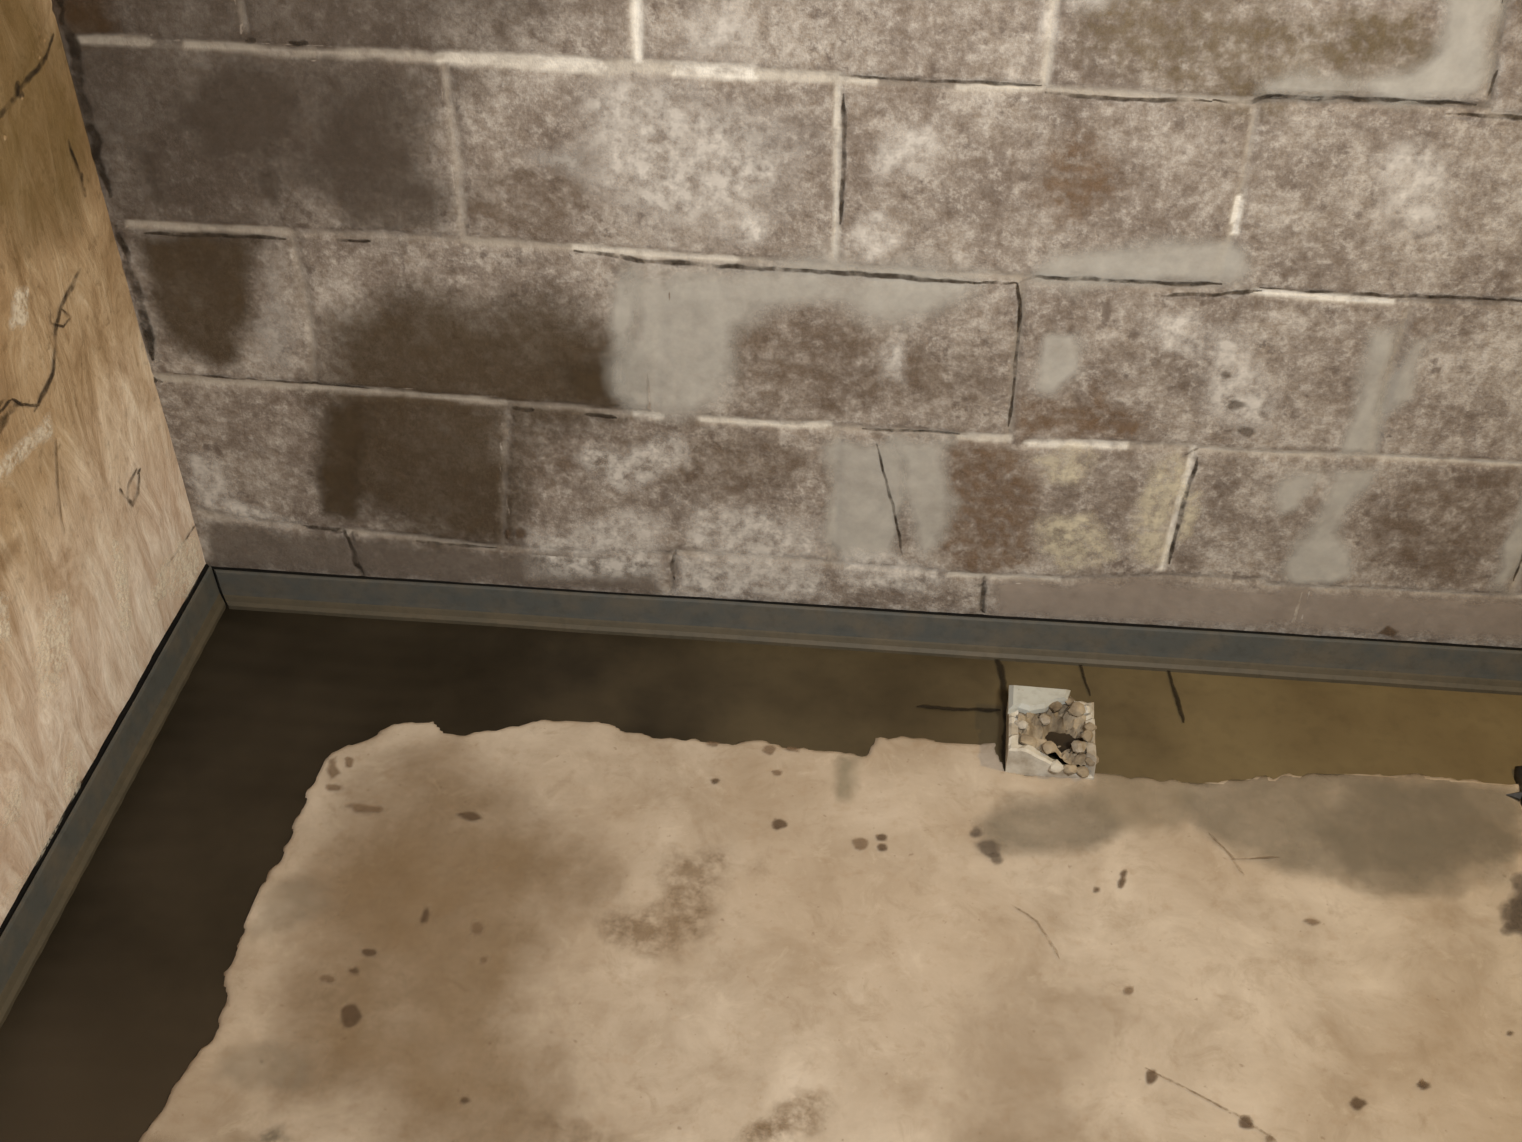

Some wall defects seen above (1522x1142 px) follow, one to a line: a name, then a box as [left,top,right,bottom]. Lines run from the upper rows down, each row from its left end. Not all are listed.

crack [0,286,73,428]
leakage [146,236,286,363]
leakage [321,287,633,540]
leakage [192,456,282,521]